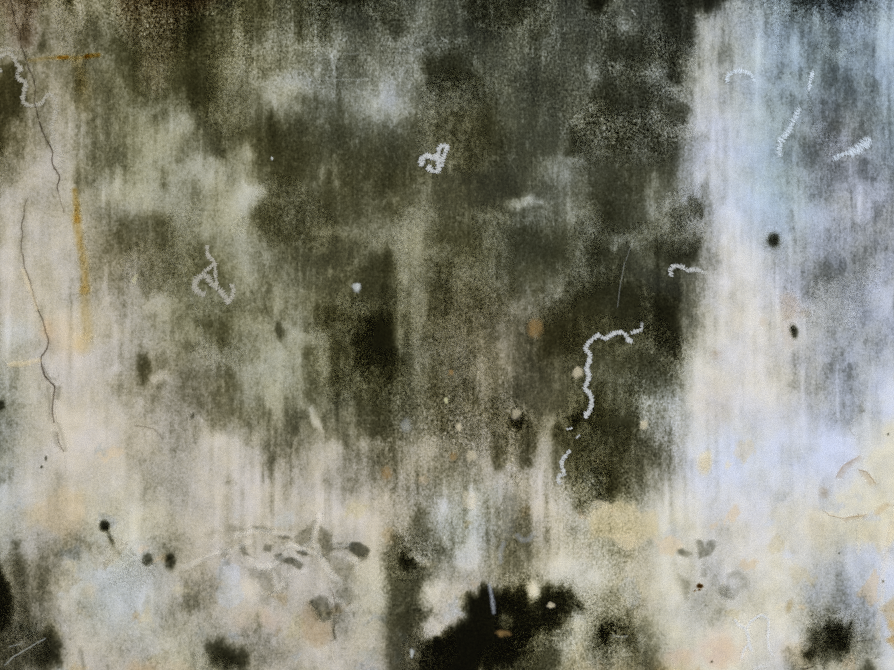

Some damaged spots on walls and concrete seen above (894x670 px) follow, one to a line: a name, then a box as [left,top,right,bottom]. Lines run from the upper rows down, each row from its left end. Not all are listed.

crack [11,1,60,191]
leakage [763,0,867,48]
leakage [794,59,857,168]
leakage [859,158,878,181]
crack [21,206,67,469]
mould [302,246,404,441]
leakage [418,0,726,513]
mould [0,541,63,670]
mould [382,504,585,670]
mould [803,589,853,667]